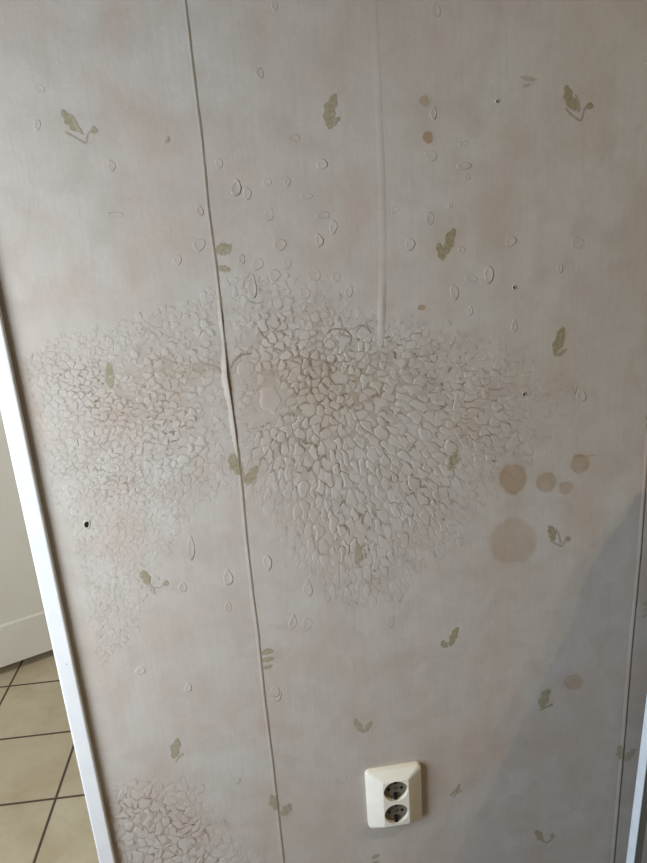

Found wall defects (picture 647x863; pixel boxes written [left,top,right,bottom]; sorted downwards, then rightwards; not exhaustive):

crack [21,0,378,863]
crack [314,456,403,602]
damp [96,287,636,574]
crack [351,477,421,577]
crack [367,440,499,559]
crack [355,315,570,479]